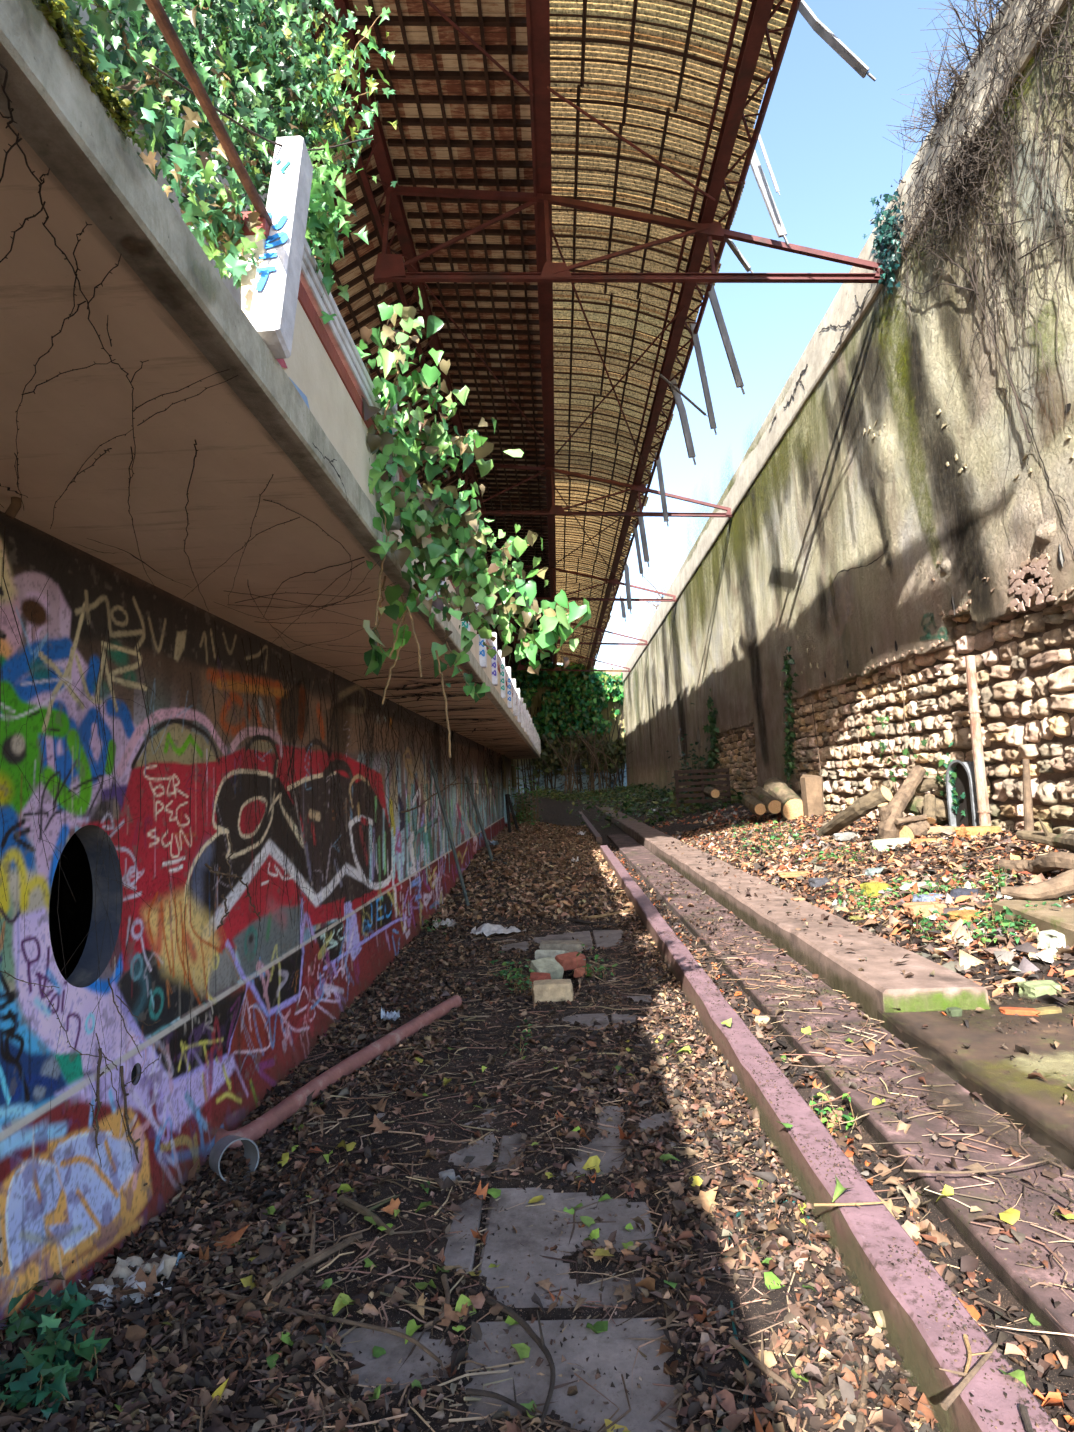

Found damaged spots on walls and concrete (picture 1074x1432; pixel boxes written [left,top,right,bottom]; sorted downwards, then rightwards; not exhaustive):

water stain [993,222,1022,307]
water stain [1013,143,1074,275]
water stain [931,274,967,386]
crack [313,444,350,507]
water stain [823,322,992,628]
water stain [623,437,824,762]
water stain [817,578,838,628]
spalling [939,553,1074,619]